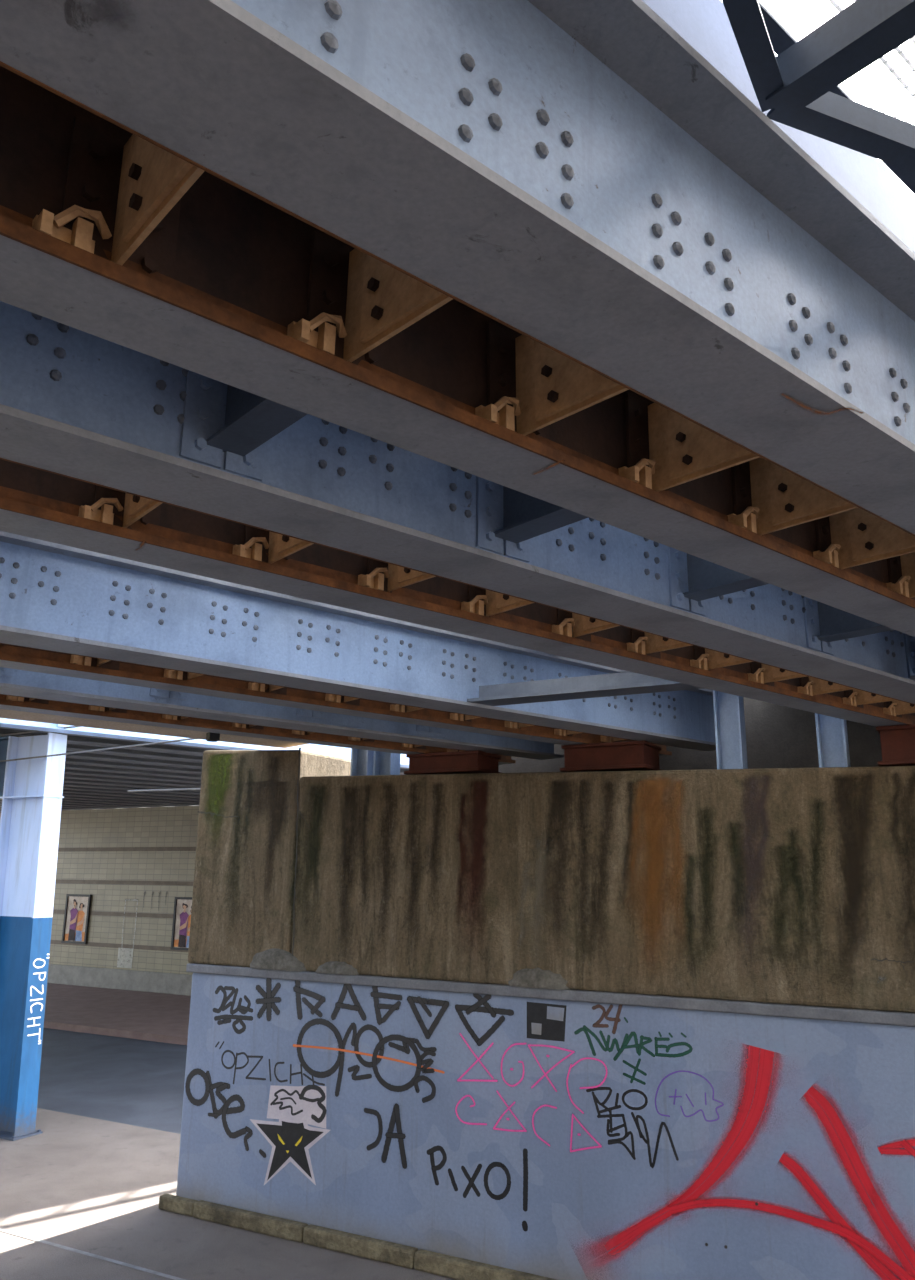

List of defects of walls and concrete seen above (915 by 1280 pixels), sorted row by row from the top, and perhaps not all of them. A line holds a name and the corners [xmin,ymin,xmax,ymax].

damp [207,754,325,906]
damp [342,783,441,914]
damp [520,781,636,928]
damp [685,809,713,945]
damp [730,775,872,948]
damp [891,773,915,928]